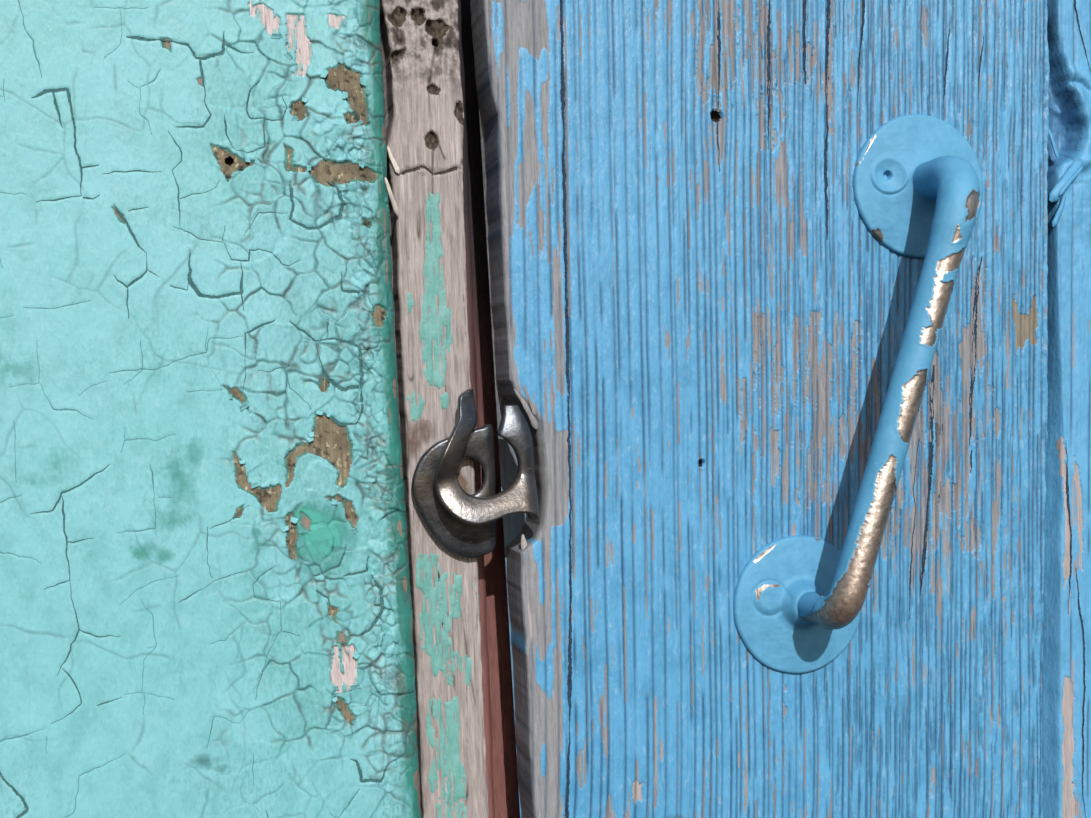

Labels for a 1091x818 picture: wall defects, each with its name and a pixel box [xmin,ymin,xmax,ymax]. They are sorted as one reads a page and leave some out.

peeling [693,0,835,152]
crack [0,0,381,426]
peeling [284,144,381,187]
peeling [740,309,862,508]
peeling [233,411,359,560]
crack [0,772,29,818]
crack [0,420,300,753]
crack [314,544,385,637]
crack [330,733,408,818]
peeling [416,553,478,818]
peeling [1062,677,1075,818]
crack [1066,447,1086,818]